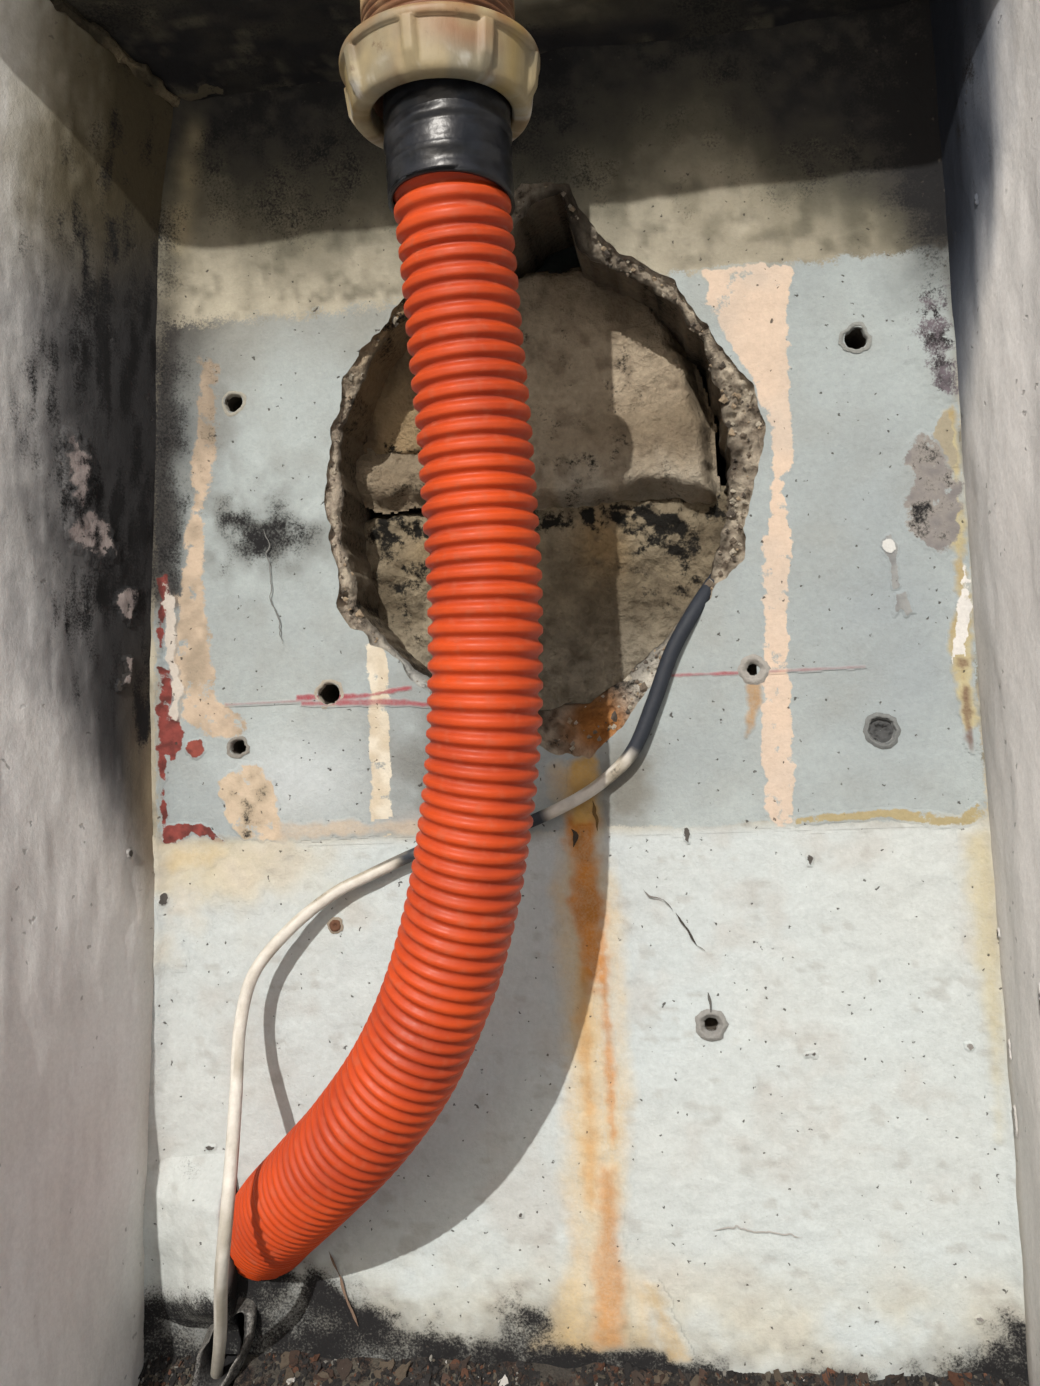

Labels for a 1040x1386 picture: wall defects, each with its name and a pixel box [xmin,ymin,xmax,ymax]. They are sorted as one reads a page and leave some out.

peeling [55,424,131,571]
spalling [112,298,433,845]
spalling [510,182,799,831]
peeling [878,256,973,671]
corrosion [522,751,696,1366]